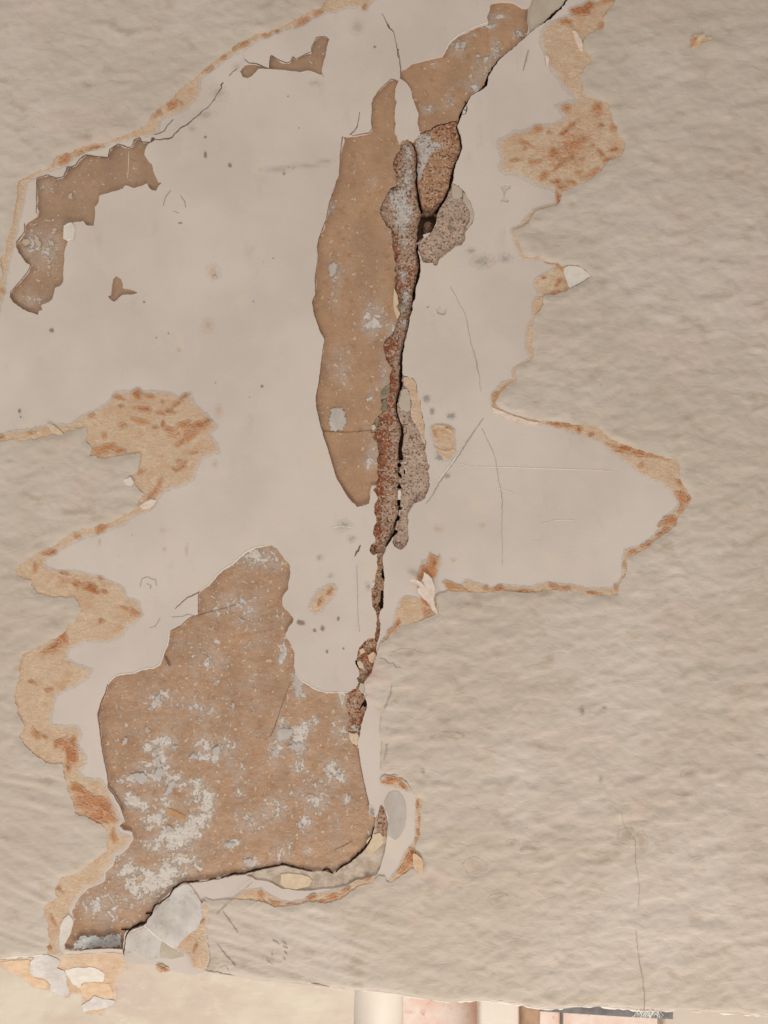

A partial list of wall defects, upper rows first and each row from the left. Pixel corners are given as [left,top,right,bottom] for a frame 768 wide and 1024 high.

peeling [10,137,161,315]
crack [379,0,566,609]
peeling [59,3,528,950]
crack [355,658,400,710]
spalling [29,955,70,997]
spalling [81,996,115,1012]